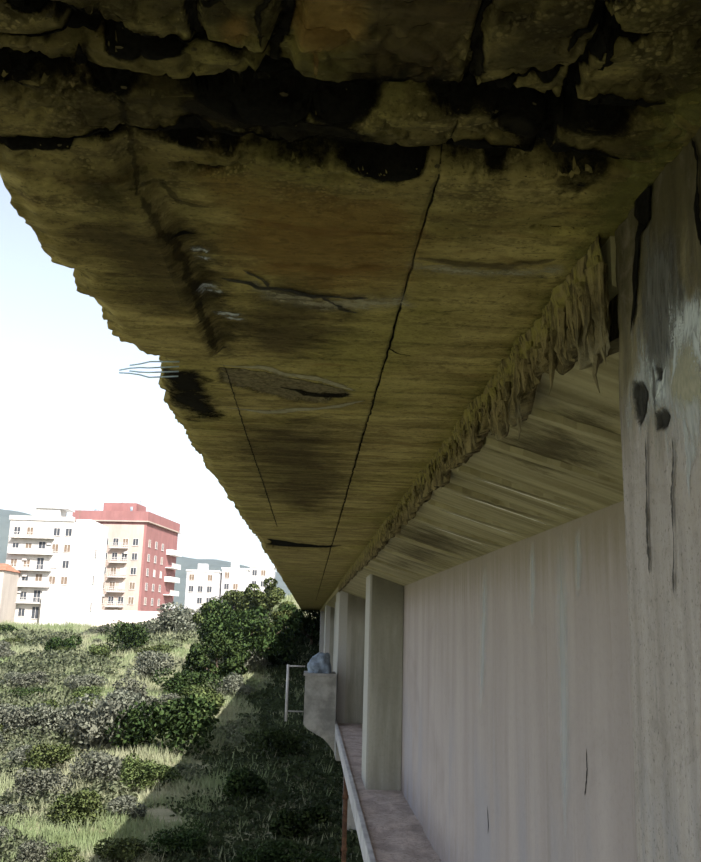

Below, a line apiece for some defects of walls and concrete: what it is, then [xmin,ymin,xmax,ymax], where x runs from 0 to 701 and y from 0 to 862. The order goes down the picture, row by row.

leakage [353,0,477,79]
crack [691,139,701,245]
crack [0,0,666,599]
leakage [162,368,225,422]
spalling [219,365,362,414]
spalling [338,234,619,593]
spalling [632,382,671,430]
leakage [636,235,701,495]